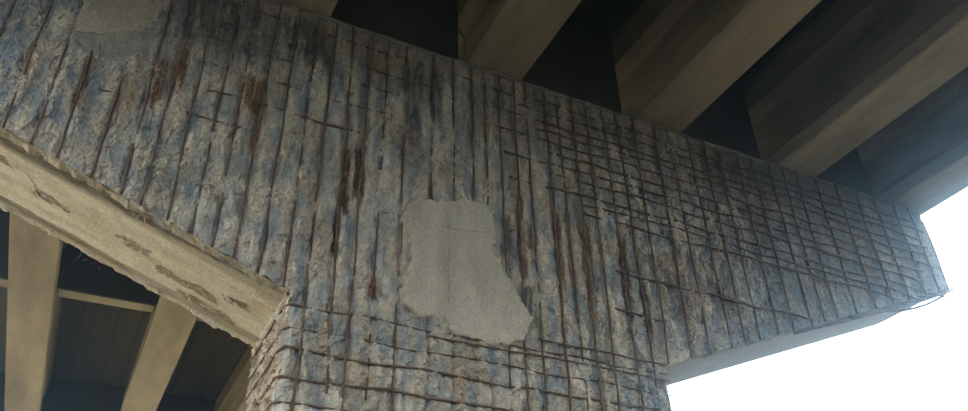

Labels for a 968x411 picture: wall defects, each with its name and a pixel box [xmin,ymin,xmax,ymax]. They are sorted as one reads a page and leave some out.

peeling [35,191,70,213]
peeling [115,234,151,256]
peeling [156,265,249,326]
spalling [246,306,299,411]